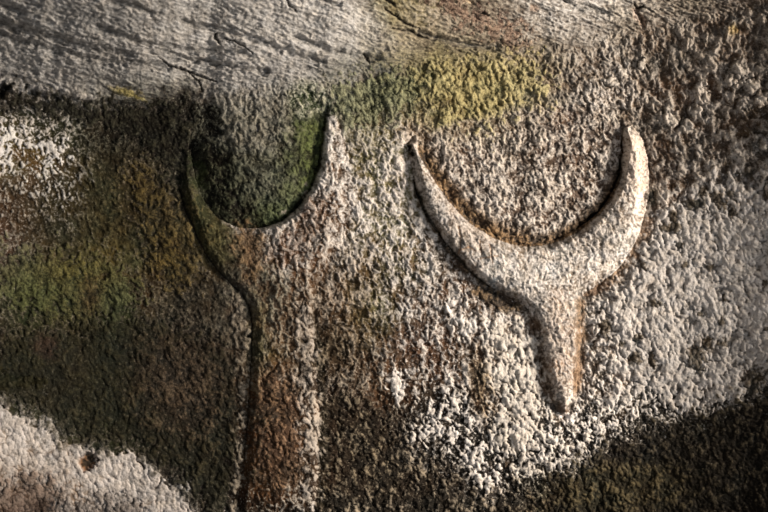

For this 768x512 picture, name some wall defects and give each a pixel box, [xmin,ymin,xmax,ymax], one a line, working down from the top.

crack [384,0,429,39]
damp [0,75,201,219]
damp [0,400,197,512]
damp [223,291,255,512]
damp [291,165,768,512]